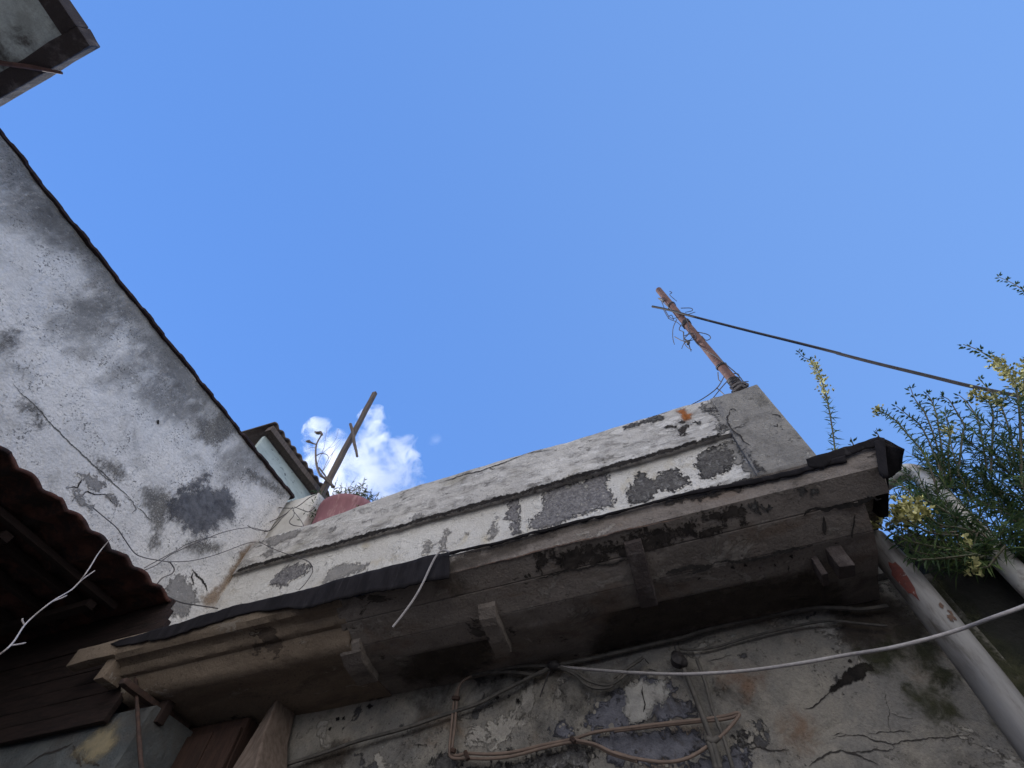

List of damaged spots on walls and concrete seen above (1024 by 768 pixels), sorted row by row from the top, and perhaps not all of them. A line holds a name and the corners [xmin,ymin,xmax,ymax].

crack [13,383,154,522]
peeling [165,573,200,621]
damp [143,473,236,554]
peeling [268,561,314,589]
peeling [486,442,767,541]
peeling [524,496,776,579]
flaking render [428,675,758,768]
crack [809,695,970,766]